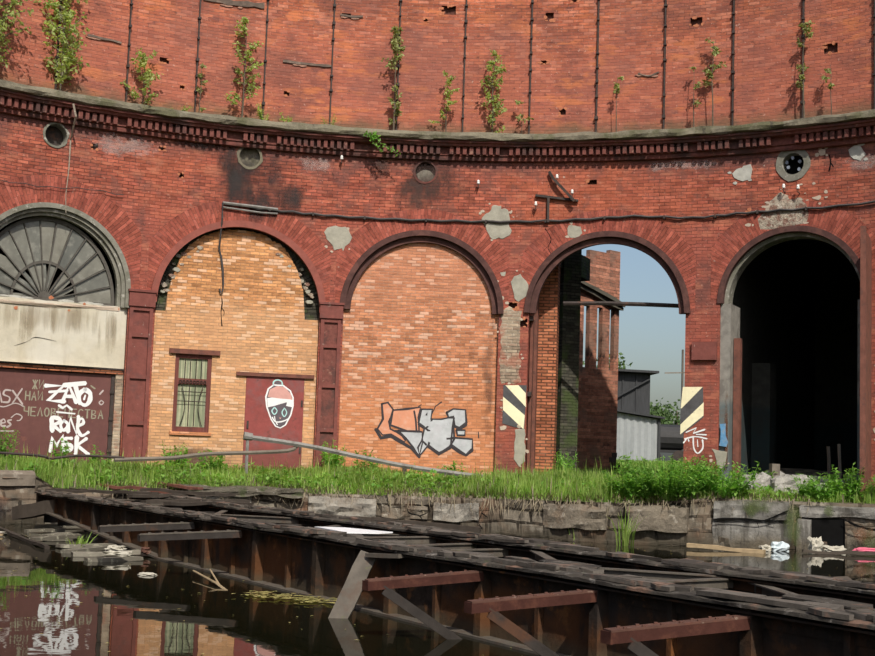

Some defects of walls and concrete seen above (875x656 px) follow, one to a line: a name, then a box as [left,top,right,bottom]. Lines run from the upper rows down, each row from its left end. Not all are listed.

leakage [220,148,274,217]
leakage [283,187,302,207]
peeling [324,226,352,253]
peeling [479,203,514,241]
spalling [745,182,828,230]
spalling [497,270,528,384]
peeling [500,425,529,467]